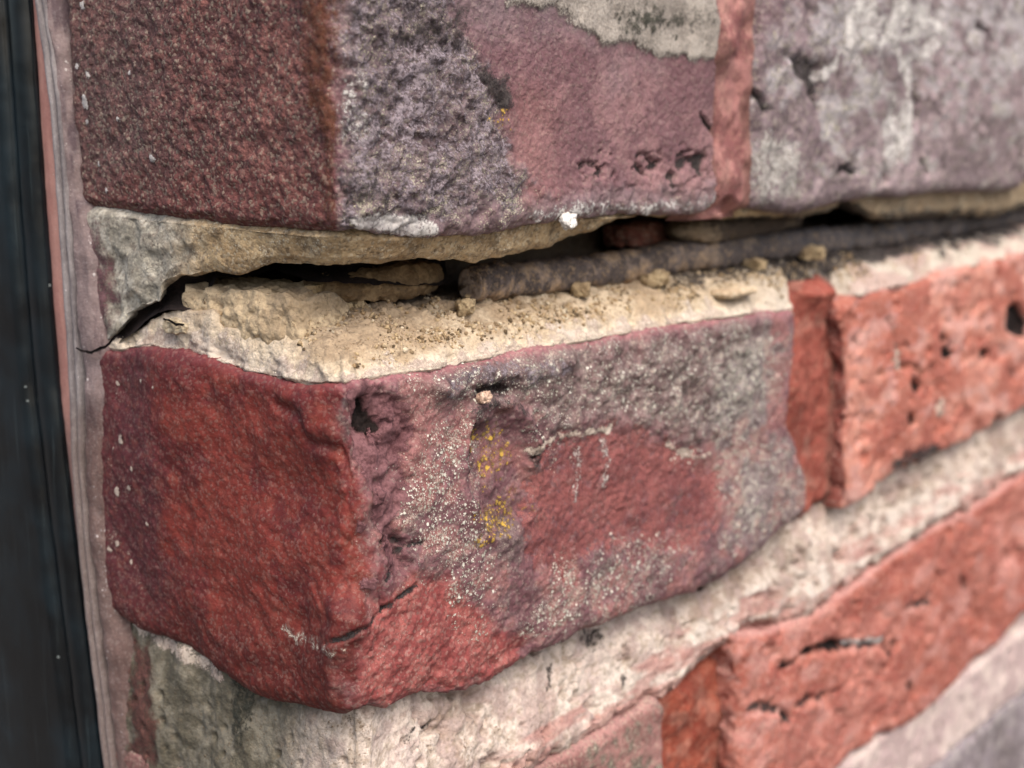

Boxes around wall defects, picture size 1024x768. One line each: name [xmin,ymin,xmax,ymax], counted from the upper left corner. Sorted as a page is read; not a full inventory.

spalling [664,217,803,244]
spalling [798,244,826,261]
spalling [742,257,768,271]
spalling [640,269,670,289]
peeling [710,285,758,299]
crack [76,258,448,354]
spalling [454,298,476,317]
spalling [162,317,190,335]
crack [330,537,423,643]
crack [777,638,895,671]
crack [746,689,837,723]